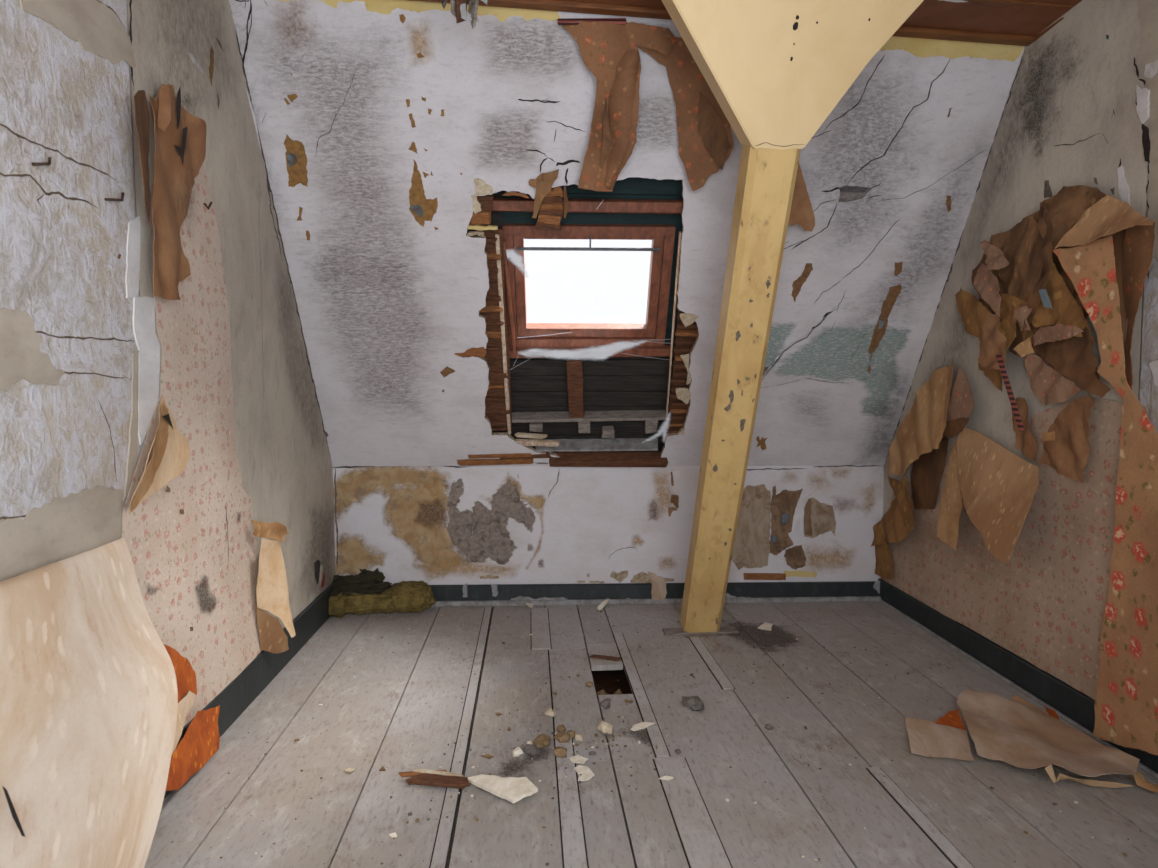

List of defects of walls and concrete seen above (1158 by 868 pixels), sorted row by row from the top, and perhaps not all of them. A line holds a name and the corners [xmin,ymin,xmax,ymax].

peeling [320,0,451,23]
peeling [467,5,560,22]
crack [0,173,97,208]
crack [0,124,115,180]
crack [756,55,1022,388]
peeling [0,216,161,582]
damp [326,270,419,403]
crack [747,232,963,471]
peeling [867,262,903,373]
peeling [1149,361,1158,387]
spalling [447,478,535,597]
peeling [724,483,836,577]